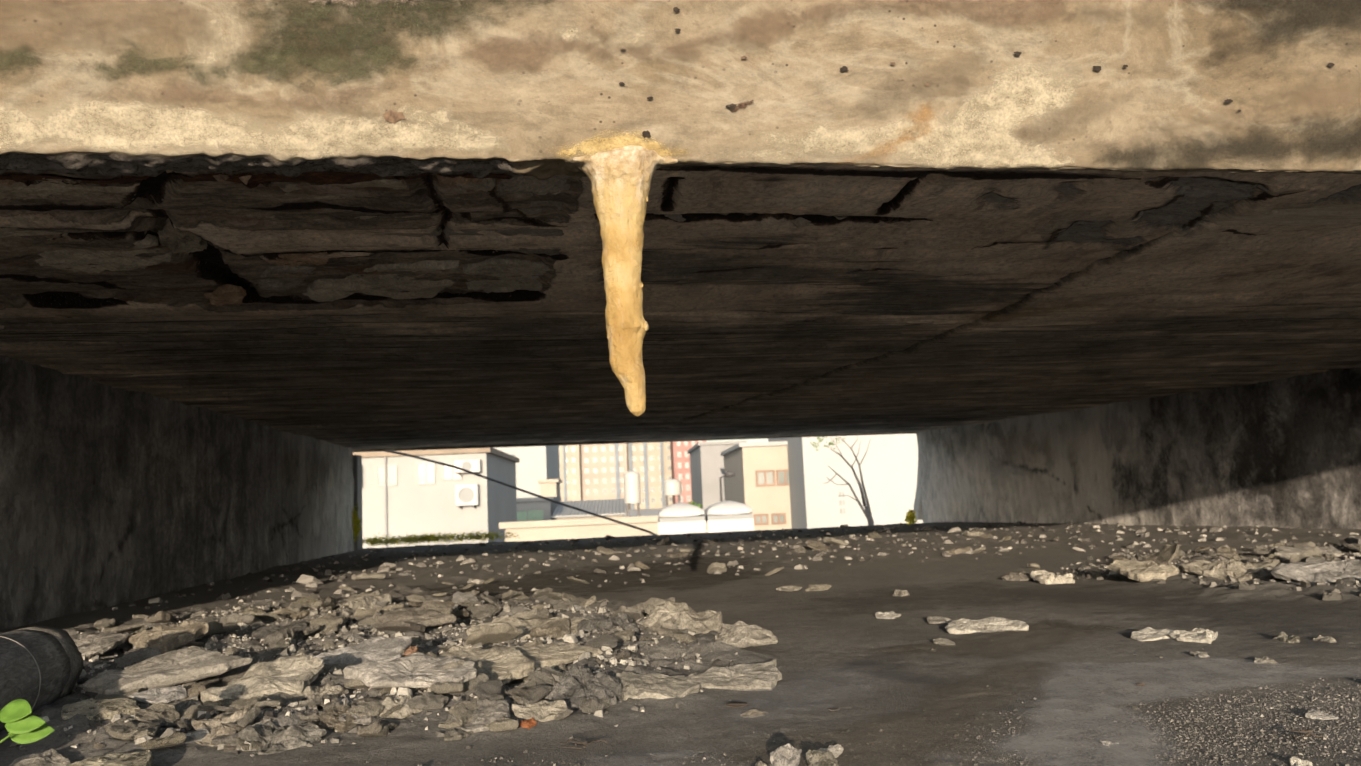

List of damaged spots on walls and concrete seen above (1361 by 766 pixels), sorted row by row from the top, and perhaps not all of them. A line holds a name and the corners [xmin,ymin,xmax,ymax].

water stain [739,6,845,42]
water stain [910,0,1068,25]
water stain [470,27,608,71]
water stain [0,86,503,160]
water stain [739,66,1079,169]
water stain [559,133,676,157]
crack [875,174,929,215]
spalling [0,152,584,330]
crack [1222,228,1265,236]